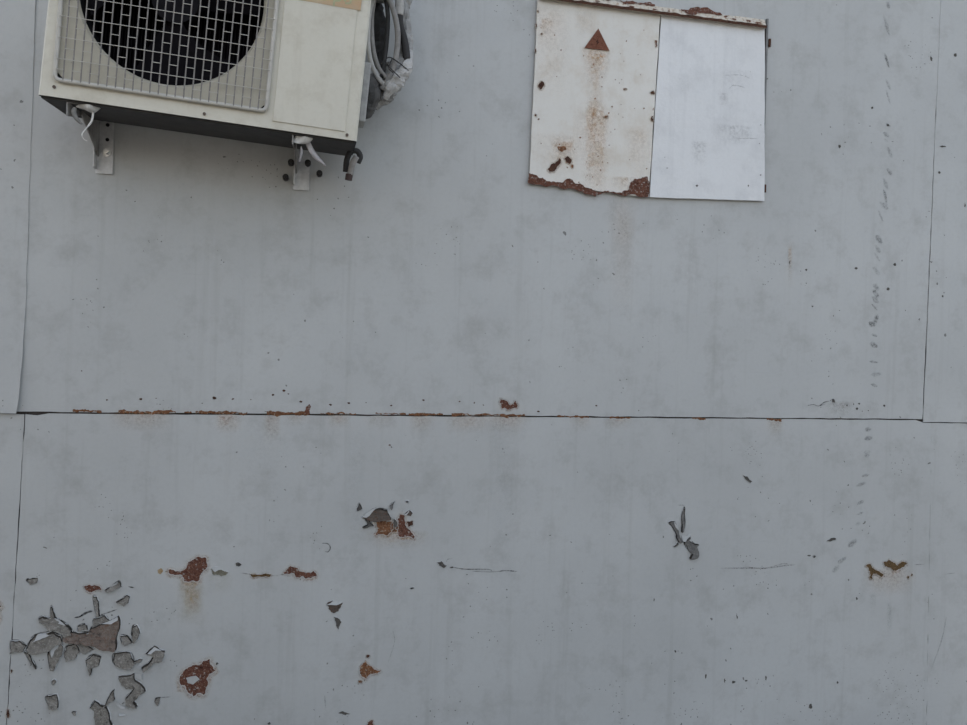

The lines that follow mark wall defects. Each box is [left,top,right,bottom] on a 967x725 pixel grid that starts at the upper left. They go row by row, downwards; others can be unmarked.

corrosion [118,397,247,416]
corrosion [267,401,356,417]
corrosion [376,398,525,418]
peeling [356,500,415,540]
peeling [668,507,699,560]
corrosion [158,556,209,583]
corrosion [865,559,918,580]
peeling [10,580,166,725]
corrosion [178,658,219,697]
corrosion [358,654,382,683]